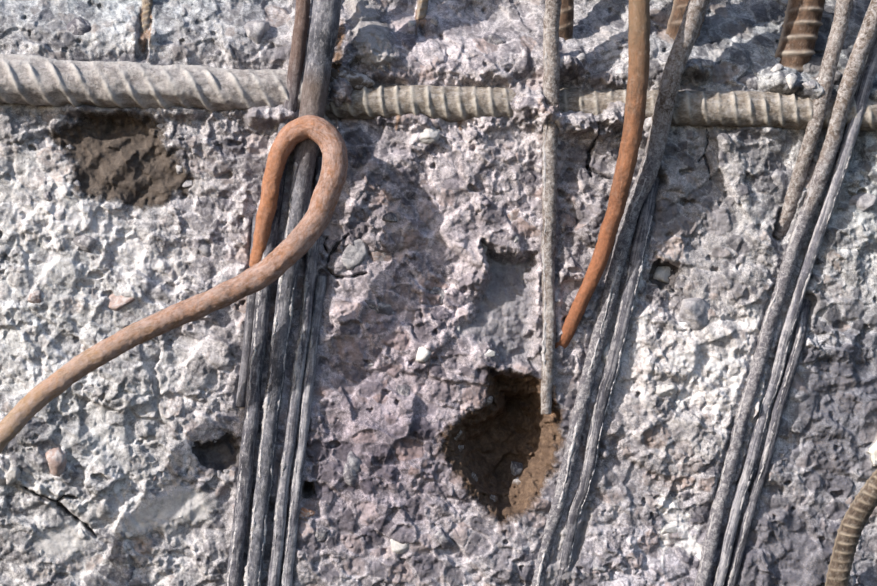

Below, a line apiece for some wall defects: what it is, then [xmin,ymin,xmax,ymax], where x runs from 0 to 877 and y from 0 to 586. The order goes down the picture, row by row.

spalling [559,0,574,41]
spalling [775,0,825,72]
spalling [0,54,304,210]
spalling [325,84,516,122]
spalling [559,87,627,115]
spalling [645,90,659,119]
spalling [671,90,814,129]
spalling [456,244,535,365]
crack [24,487,95,535]
spalling [34,526,88,558]
spalling [125,490,217,539]
spalling [825,460,877,586]